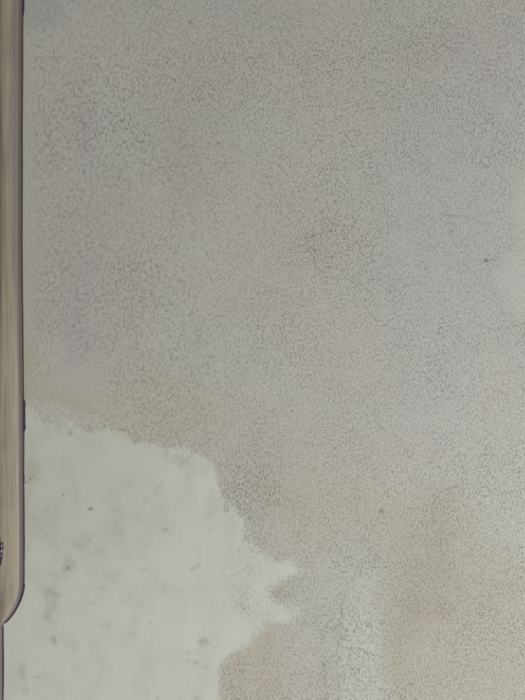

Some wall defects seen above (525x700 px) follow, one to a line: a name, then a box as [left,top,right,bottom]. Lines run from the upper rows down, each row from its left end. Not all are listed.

peeling [2,418,307,700]